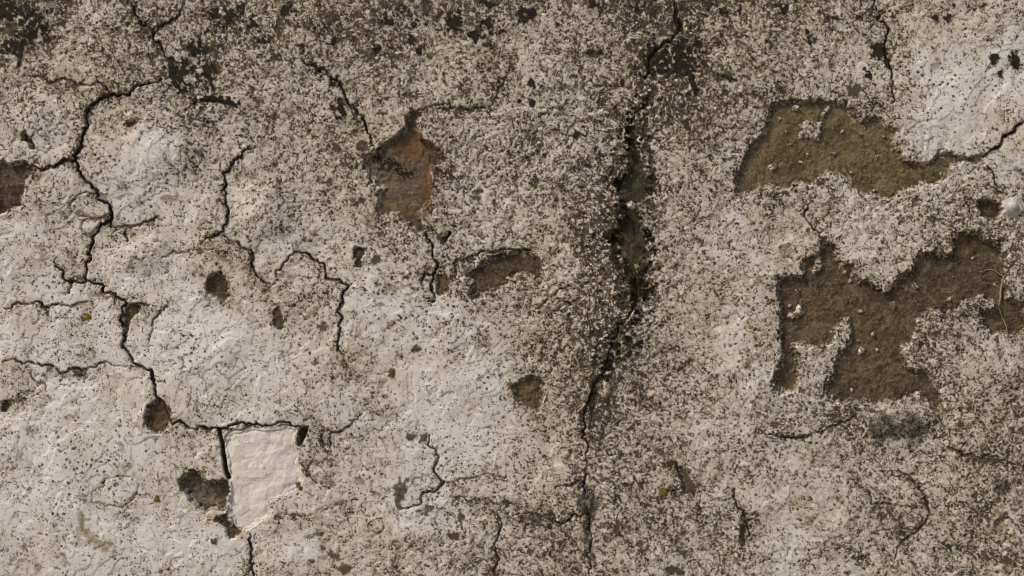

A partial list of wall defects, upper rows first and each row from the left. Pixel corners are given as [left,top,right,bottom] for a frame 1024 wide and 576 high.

crack [304,62,374,147]
corrosion [393,134,436,217]
crack [628,0,683,127]
spalling [734,99,984,199]
crack [872,1,895,103]
crack [980,122,1023,186]
crack [4,1,353,483]
spalling [467,249,544,300]
spalling [771,232,1024,409]
spalling [179,425,309,539]
crack [247,534,255,576]